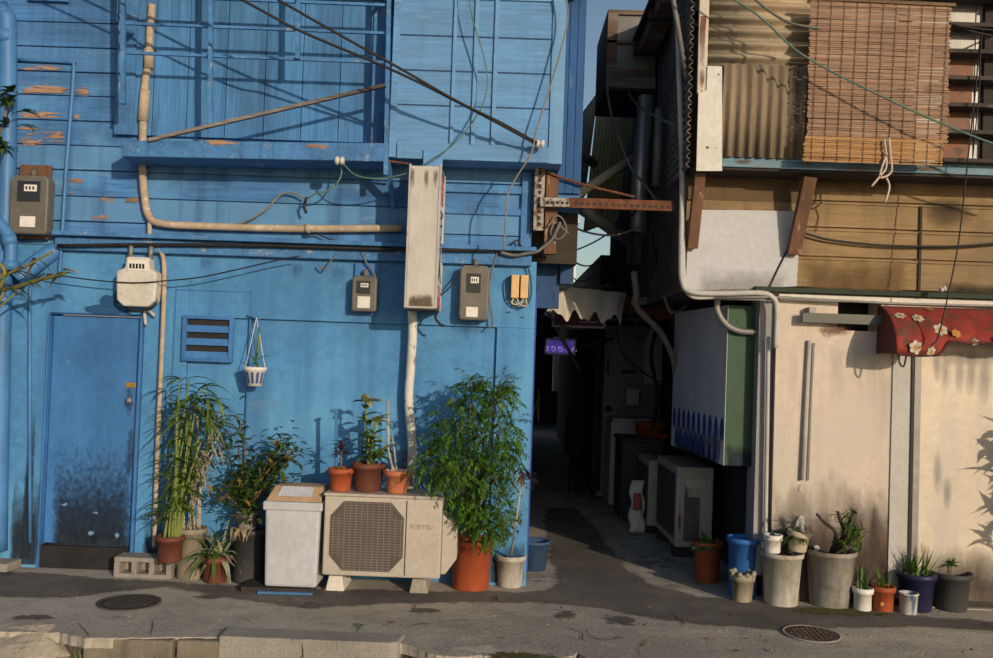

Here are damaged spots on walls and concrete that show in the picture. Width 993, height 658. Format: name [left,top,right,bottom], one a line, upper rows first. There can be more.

peeling [21,83,89,97]
peeling [18,111,64,146]
leakage [57,479,125,547]
leakage [779,509,797,555]
leakage [798,508,888,603]